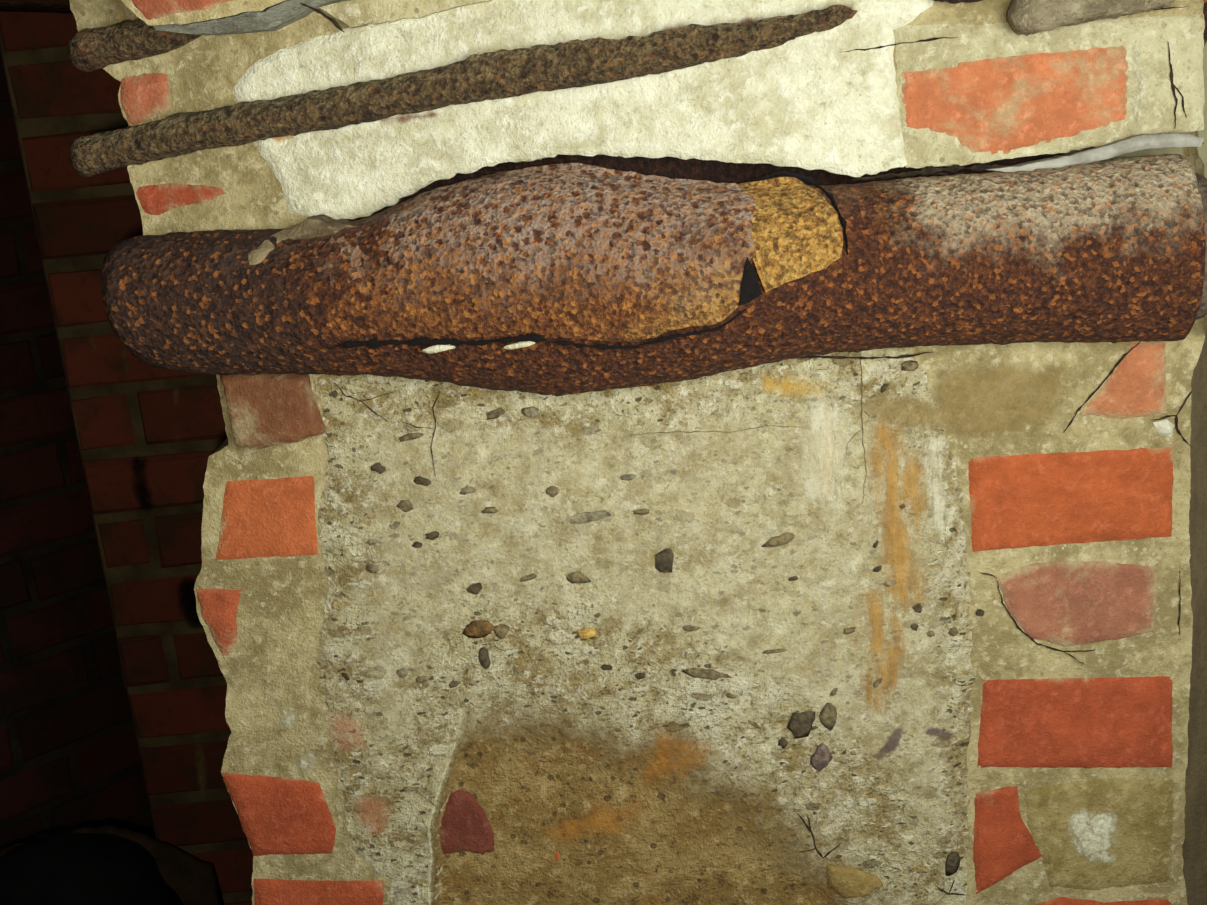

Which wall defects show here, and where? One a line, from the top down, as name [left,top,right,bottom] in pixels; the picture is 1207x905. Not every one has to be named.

corrosion [425,4,857,75]
spalling [120,73,171,126]
peeling [984,133,1204,172]
spalling [136,183,228,215]
corrosion [299,163,843,342]
crack [1063,341,1141,433]
crack [1154,391,1192,447]
corrosion [867,424,922,708]
damp [877,729,902,758]
damp [927,728,952,738]